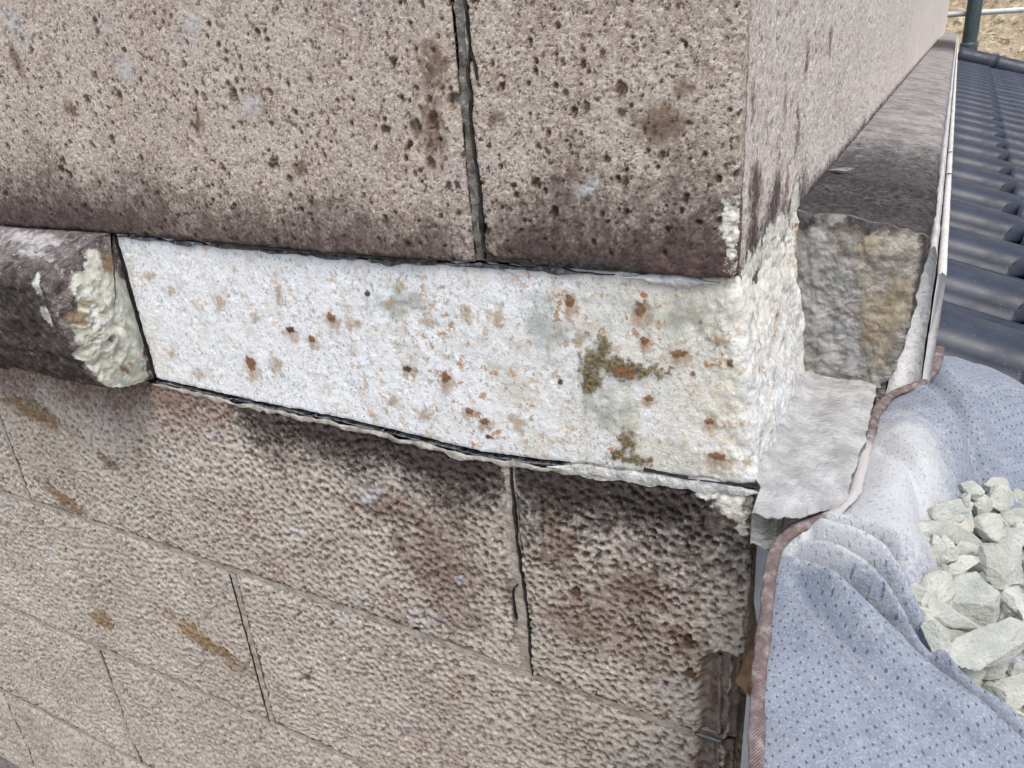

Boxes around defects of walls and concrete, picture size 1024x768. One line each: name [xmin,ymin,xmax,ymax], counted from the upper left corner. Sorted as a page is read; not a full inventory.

spalling [68,249,148,388]
water stain [0,160,754,595]
corrosion [606,365,637,380]
corrosion [633,302,646,316]
water stain [485,39,956,379]
crack [509,467,534,676]